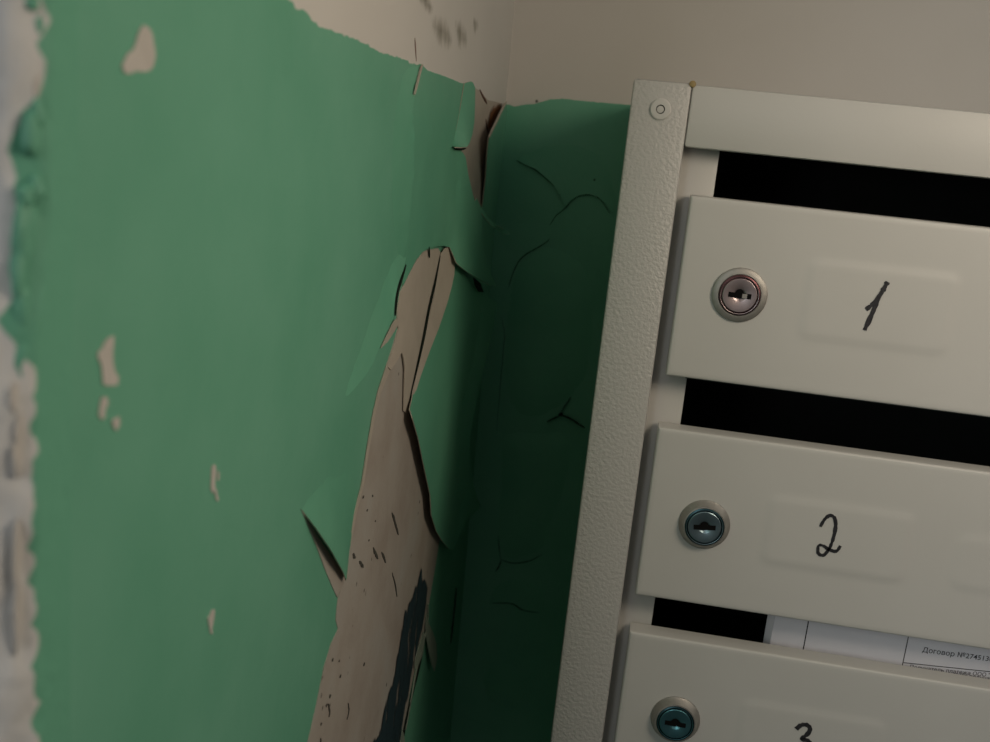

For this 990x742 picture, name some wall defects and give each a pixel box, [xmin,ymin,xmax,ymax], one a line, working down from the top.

spalling [25,0,44,34]
peeling [121,25,156,74]
spalling [9,174,46,329]
peeling [96,336,120,431]
peeling [307,64,510,742]
peeling [210,465,220,502]
spalling [12,517,23,656]